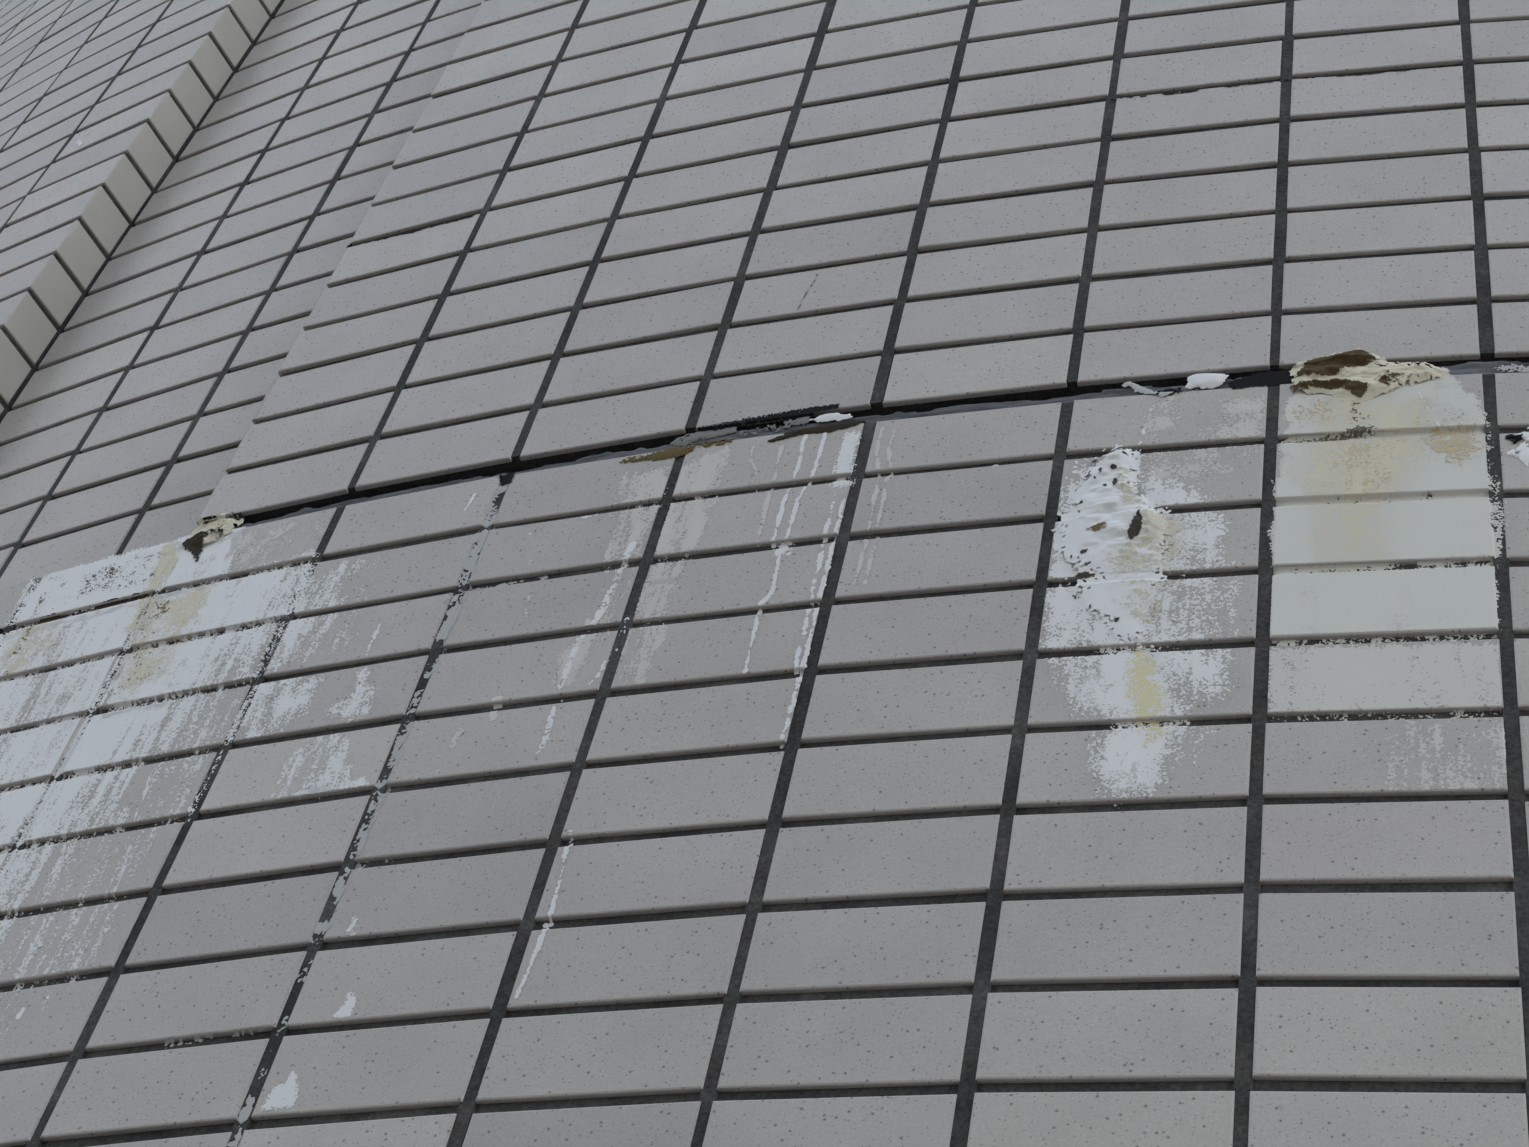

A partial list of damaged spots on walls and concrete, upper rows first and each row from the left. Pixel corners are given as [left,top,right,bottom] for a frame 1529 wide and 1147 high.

spalling [1289,348,1449,404]
crack [698,403,840,431]
spalling [182,512,244,562]
damp [535,445,732,754]
damp [742,427,896,749]
damp [1023,367,1529,799]
damp [0,483,548,1036]
damp [165,1016,288,1051]
damp [226,1068,300,1147]